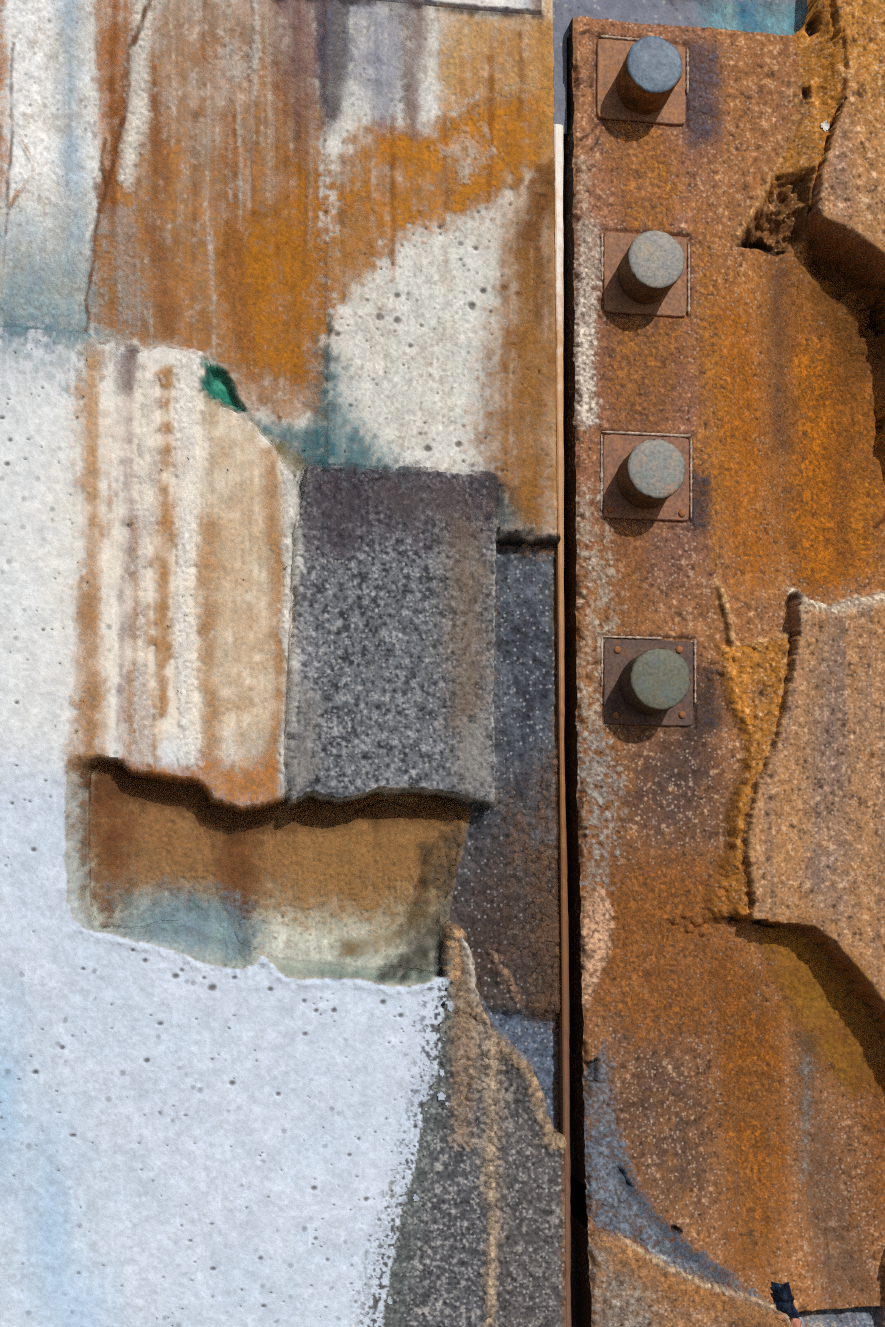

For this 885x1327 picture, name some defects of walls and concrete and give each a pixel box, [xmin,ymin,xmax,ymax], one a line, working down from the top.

rust [69,352,467,926]
rust [90,0,558,537]
rust [606,121,684,231]
rust [602,286,885,602]
spalling [715,0,885,881]
spalling [64,540,566,1327]
rust [599,1235,792,1327]
spalling [586,924,885,1327]
rust [595,846,885,1274]